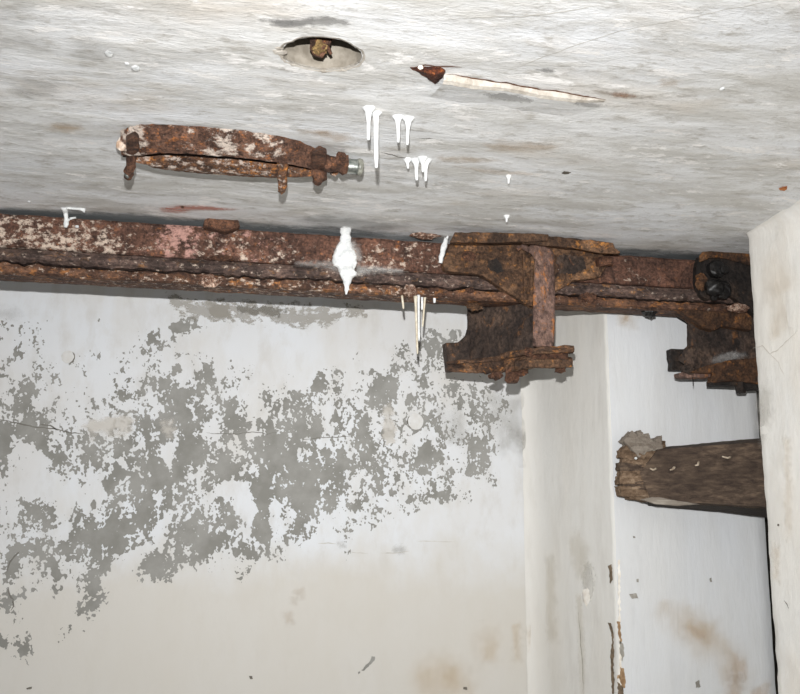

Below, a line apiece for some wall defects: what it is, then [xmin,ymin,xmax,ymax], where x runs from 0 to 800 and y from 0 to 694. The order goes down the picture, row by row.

spalling [272,36,365,73]
crack [413,0,774,116]
peeling [0,317,513,632]
peeling [0,631,34,665]
spalling [608,560,638,694]